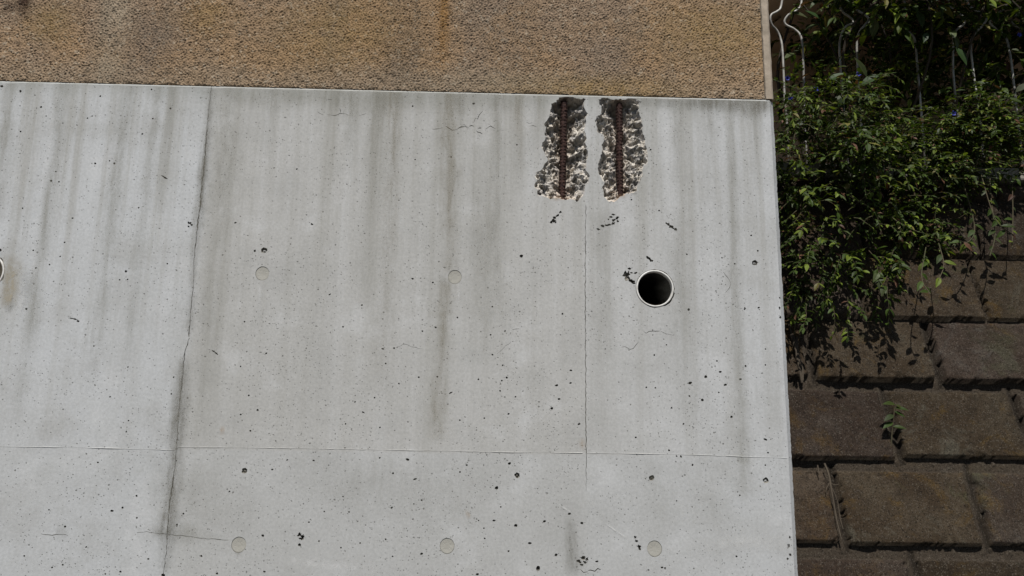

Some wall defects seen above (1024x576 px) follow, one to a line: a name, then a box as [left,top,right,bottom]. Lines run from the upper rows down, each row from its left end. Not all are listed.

crack [137,86,221,574]
spalling [534,97,652,230]